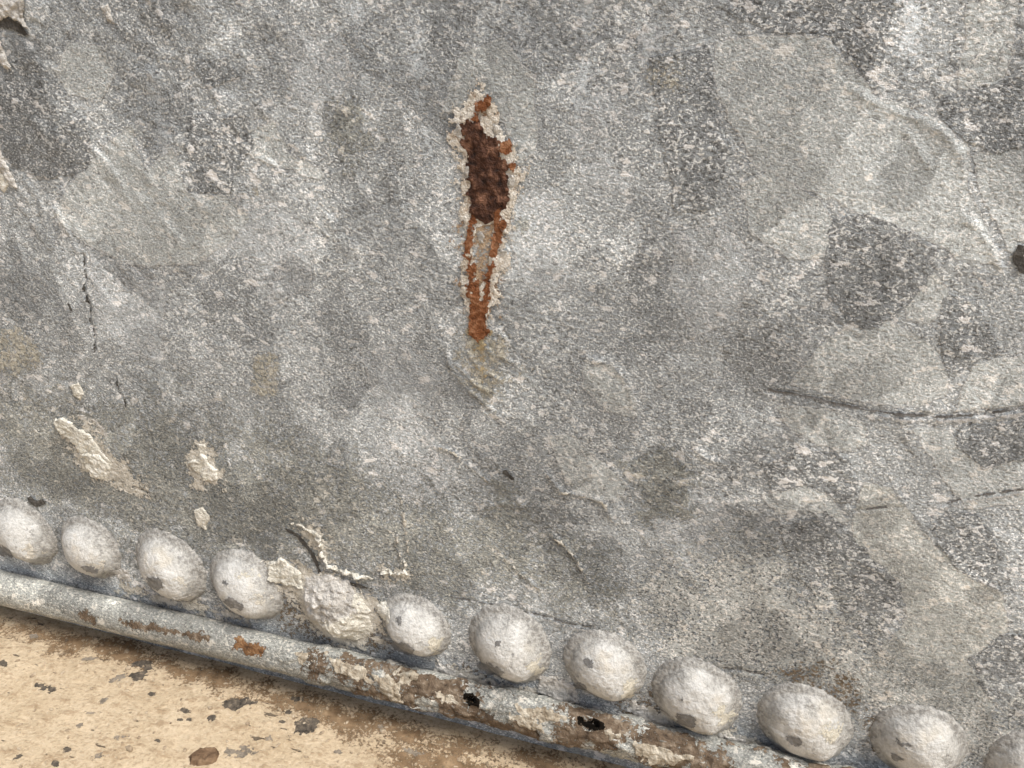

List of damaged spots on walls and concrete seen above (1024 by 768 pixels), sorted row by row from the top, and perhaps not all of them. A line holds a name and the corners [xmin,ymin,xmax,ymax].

corrosion [446,78,531,423]
crack [82,254,95,352]
peeling [53,414,158,502]
peeling [182,439,228,493]
corrosion [77,608,99,626]
corrosion [118,617,210,643]
corrosion [232,635,266,657]
peeling [267,557,373,640]
corrosion [300,647,853,768]